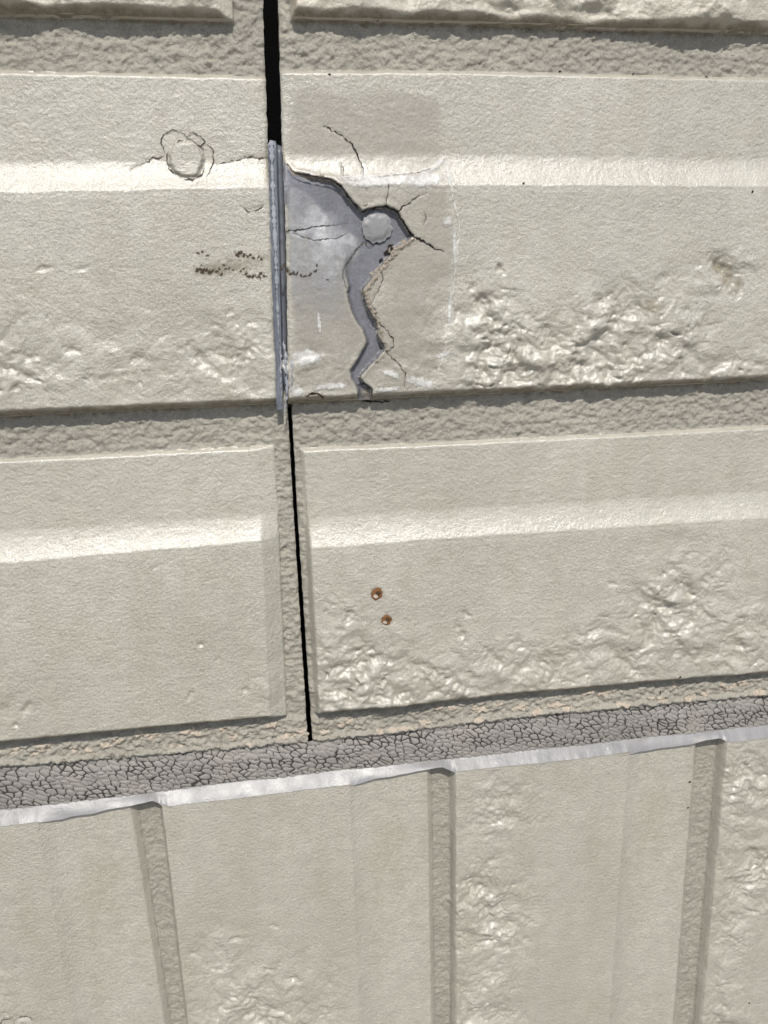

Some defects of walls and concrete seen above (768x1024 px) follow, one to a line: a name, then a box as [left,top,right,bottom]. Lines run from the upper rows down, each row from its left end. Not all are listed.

crack [323,126,444,252]
spalling [283,161,413,403]
corrosion [371,588,382,600]
crack [0,695,768,810]